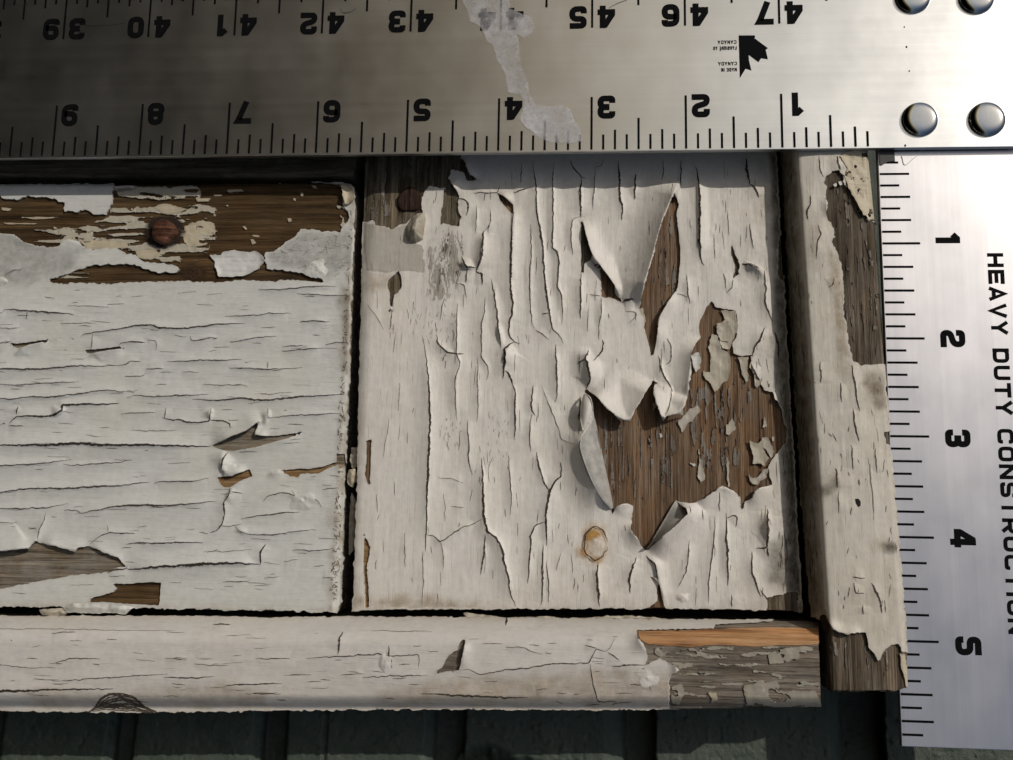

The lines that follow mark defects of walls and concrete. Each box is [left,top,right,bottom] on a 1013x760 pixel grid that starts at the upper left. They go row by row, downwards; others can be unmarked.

corrosion [145,216,185,249]
peeling [0,155,476,306]
peeling [581,222,622,302]
peeling [639,195,680,355]
peeling [824,150,884,366]
peeling [213,423,300,451]
peeling [585,302,786,550]
peeling [0,541,126,589]
peeling [39,582,161,616]
peeling [284,440,372,608]
peeling [437,640,465,673]
peeling [588,585,908,709]